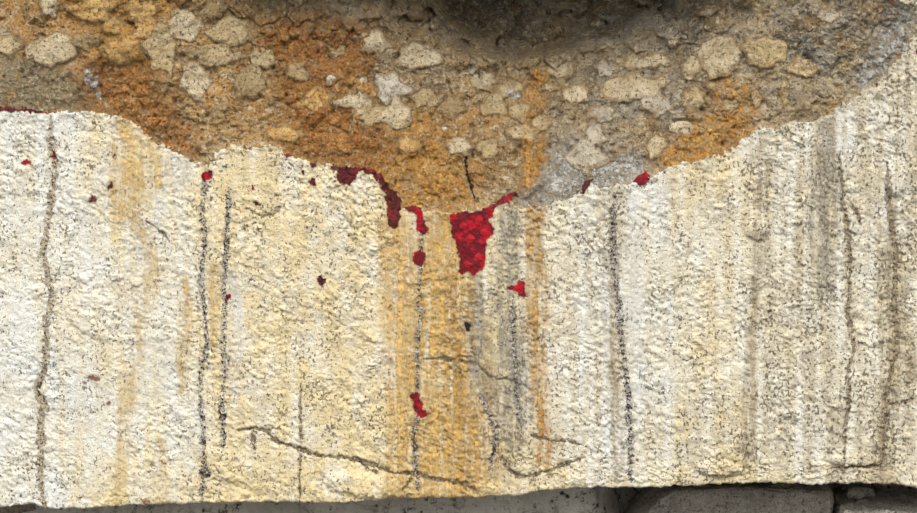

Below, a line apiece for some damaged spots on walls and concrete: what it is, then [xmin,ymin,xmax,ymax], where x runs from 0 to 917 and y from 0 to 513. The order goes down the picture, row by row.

rust [81,0,198,220]
rust [259,13,492,499]
crack [196,180,584,502]
spalling [0,0,917,275]
damp [469,203,527,452]
rust [525,207,543,275]
rust [522,67,549,188]
rust [526,278,550,472]
damp [522,142,643,207]
damp [610,340,618,387]